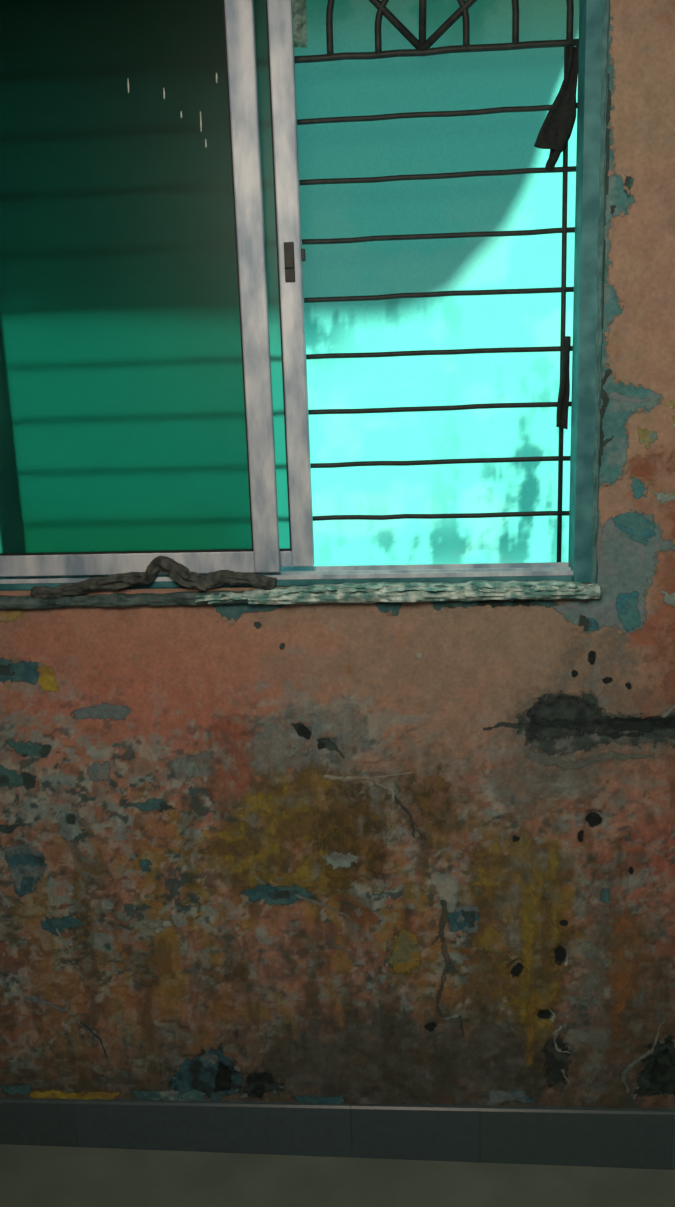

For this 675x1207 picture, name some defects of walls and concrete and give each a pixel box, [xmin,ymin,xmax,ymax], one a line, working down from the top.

peeling [430,17,675,634]
peeling [0,657,59,692]
peeling [71,703,132,721]
peeling [0,736,52,789]
peeling [133,798,177,813]
damp [170,707,451,898]
peeling [0,824,47,899]
peeling [322,851,358,871]
peeling [239,882,349,916]
peeling [39,915,84,955]
flaking render [168,1044,285,1101]
flaking render [620,1017,675,1101]